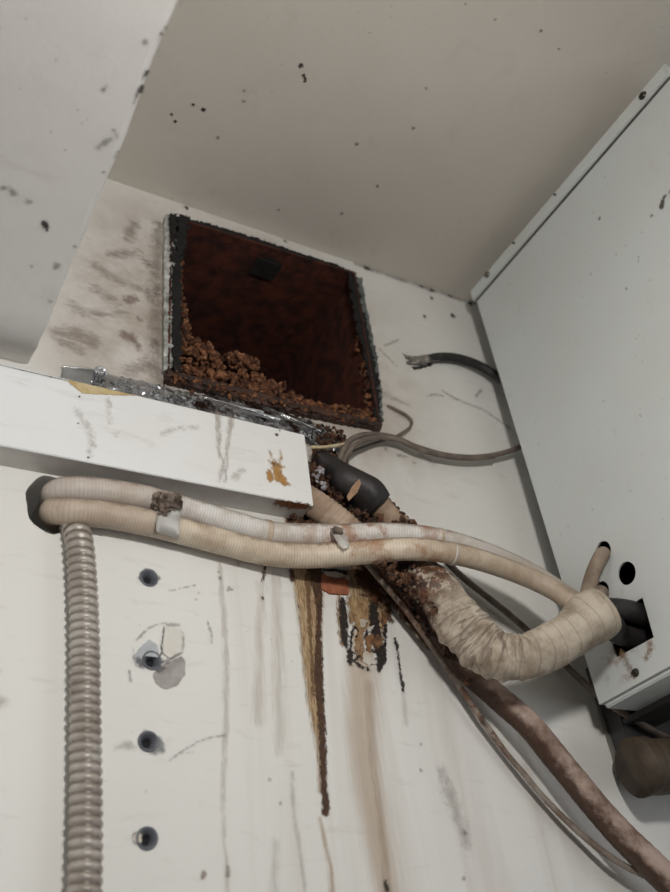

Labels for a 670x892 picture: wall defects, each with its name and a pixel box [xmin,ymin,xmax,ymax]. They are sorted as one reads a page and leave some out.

rust [266,453,290,486]
peeling [321,568,388,672]
rust [289,568,331,816]